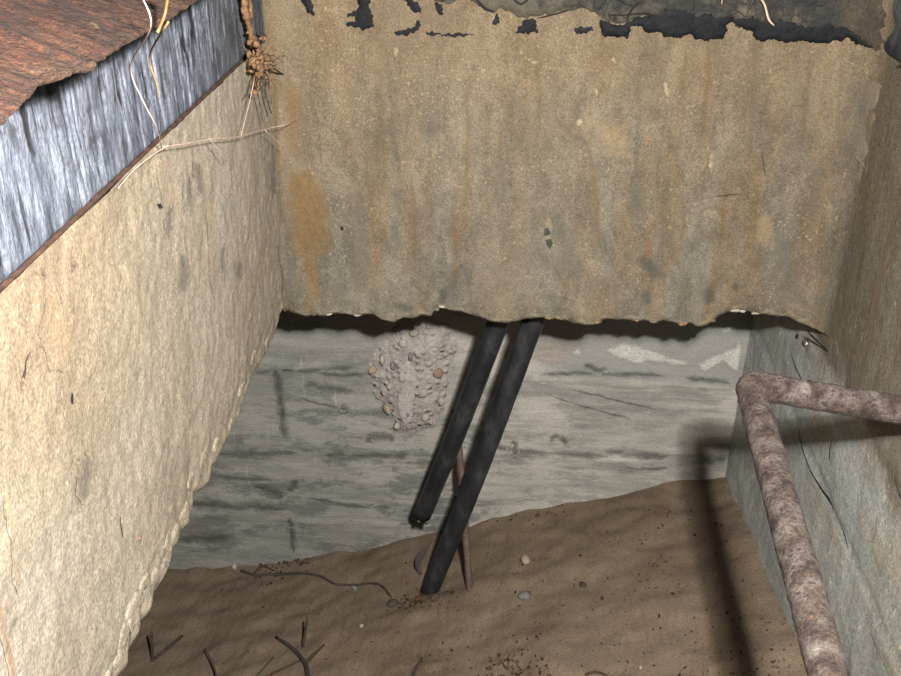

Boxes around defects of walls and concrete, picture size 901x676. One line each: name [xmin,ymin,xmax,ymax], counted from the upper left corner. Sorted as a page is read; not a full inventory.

peeling [301,0,315,16]
peeling [346,0,374,31]
peeling [393,0,474,38]
peeling [471,0,887,51]
damp [839,66,882,168]
corrosion [271,61,342,310]
damp [555,87,652,235]
damp [283,177,408,307]
damp [633,251,664,310]